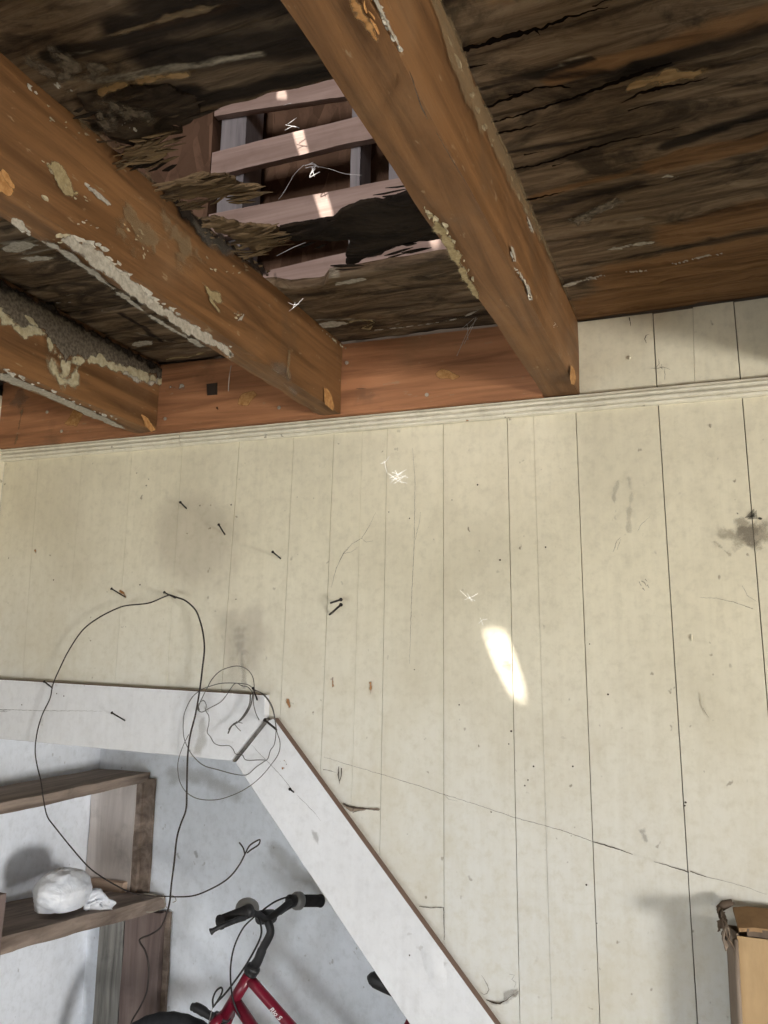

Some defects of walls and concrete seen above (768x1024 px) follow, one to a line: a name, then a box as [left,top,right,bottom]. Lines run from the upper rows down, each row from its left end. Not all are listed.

water stain [26,46,110,92]
crack [461,0,608,69]
spalling [47,105,185,178]
water stain [92,101,154,132]
peeling [433,0,605,292]
crack [484,62,708,170]
crack [527,191,564,201]
spalling [201,215,293,274]
peeling [11,218,234,358]
crack [329,758,764,894]